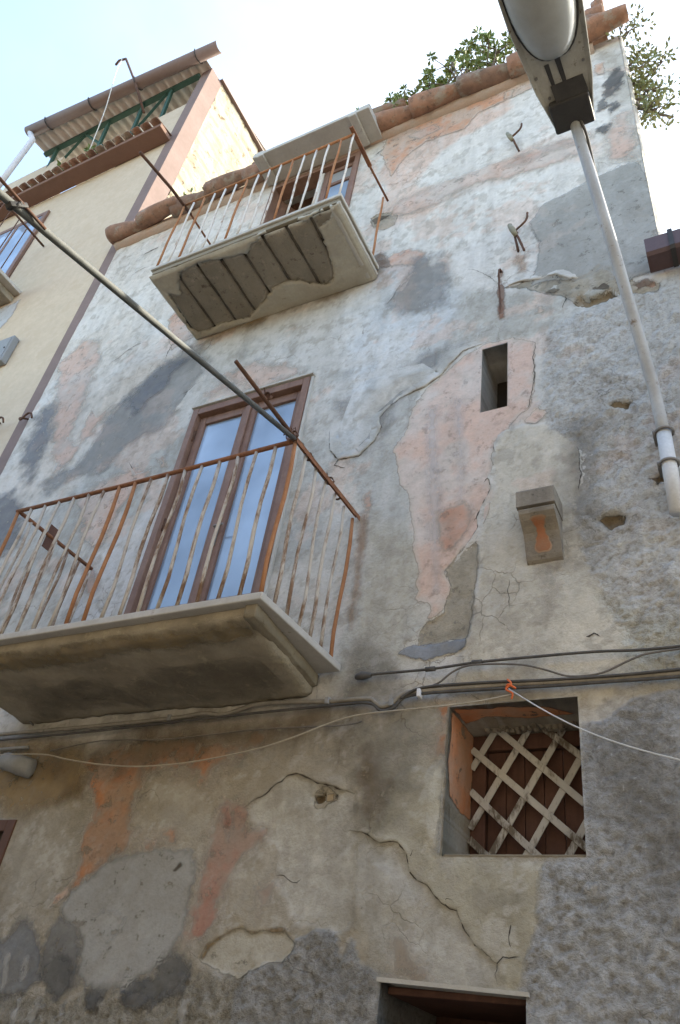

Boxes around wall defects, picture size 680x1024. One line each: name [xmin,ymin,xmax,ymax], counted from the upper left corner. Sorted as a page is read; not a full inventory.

damp [394,257,447,312]
rust [497,268,505,319]
damp [21,405,58,480]
damp [45,316,265,494]
crack [329,336,482,468]
damp [0,491,22,551]
peeling [393,337,547,648]
spalling [600,515,626,531]
peeling [54,731,265,902]
crack [241,756,358,807]
crack [349,819,516,981]
spalling [200,927,295,979]